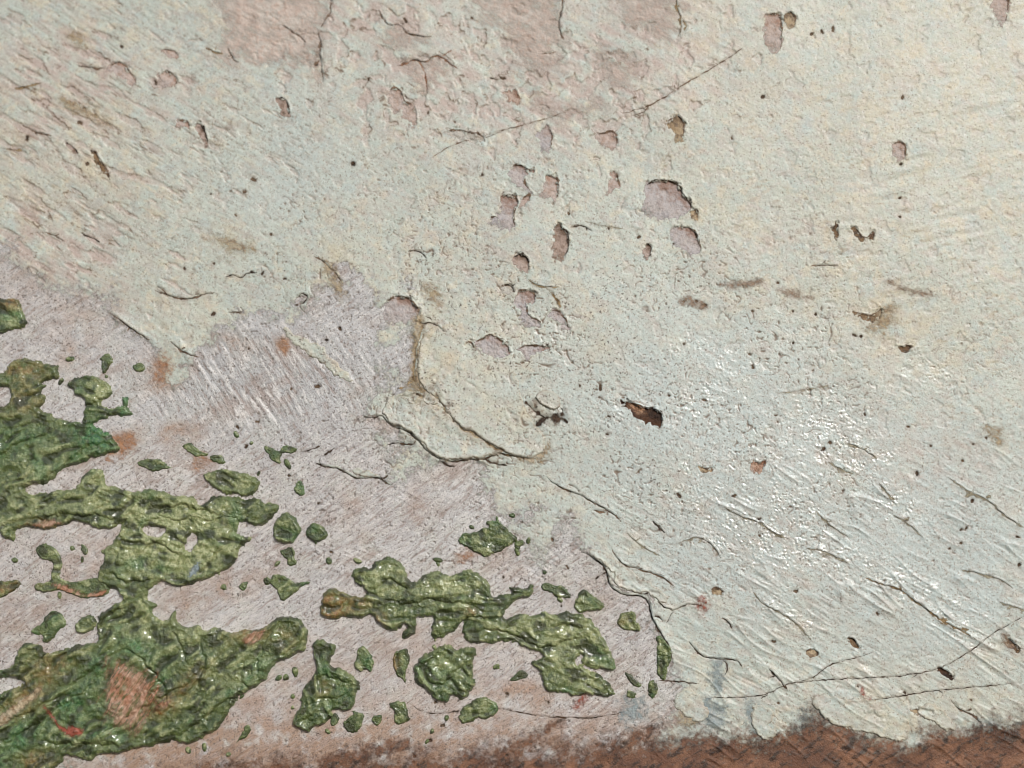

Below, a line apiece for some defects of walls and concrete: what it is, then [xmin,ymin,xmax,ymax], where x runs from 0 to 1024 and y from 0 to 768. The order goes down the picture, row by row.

crack [501,279,561,307]
crack [399,308,442,398]
crack [525,400,569,426]
crack [307,445,391,486]
peeling [0,235,709,768]
crack [364,413,1024,724]